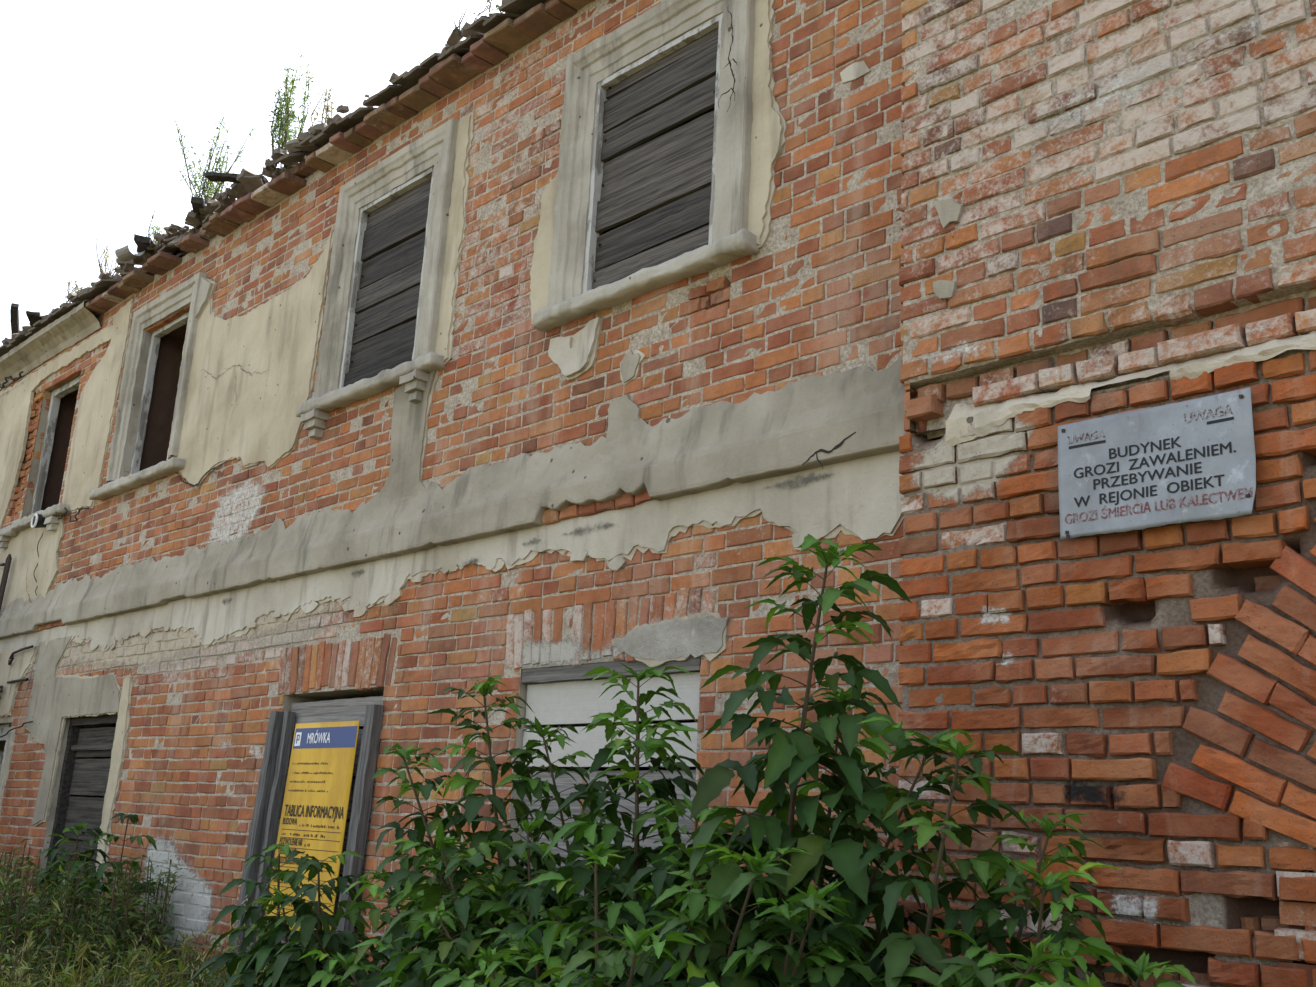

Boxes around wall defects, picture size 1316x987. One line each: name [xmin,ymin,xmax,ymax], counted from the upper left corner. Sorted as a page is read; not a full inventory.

peeling [167,229,334,490]
peeling [378,112,474,504]
peeling [548,317,603,381]
peeling [606,349,646,443]
crack [802,432,856,468]
peeling [945,331,1316,450]
peeling [0,451,904,912]